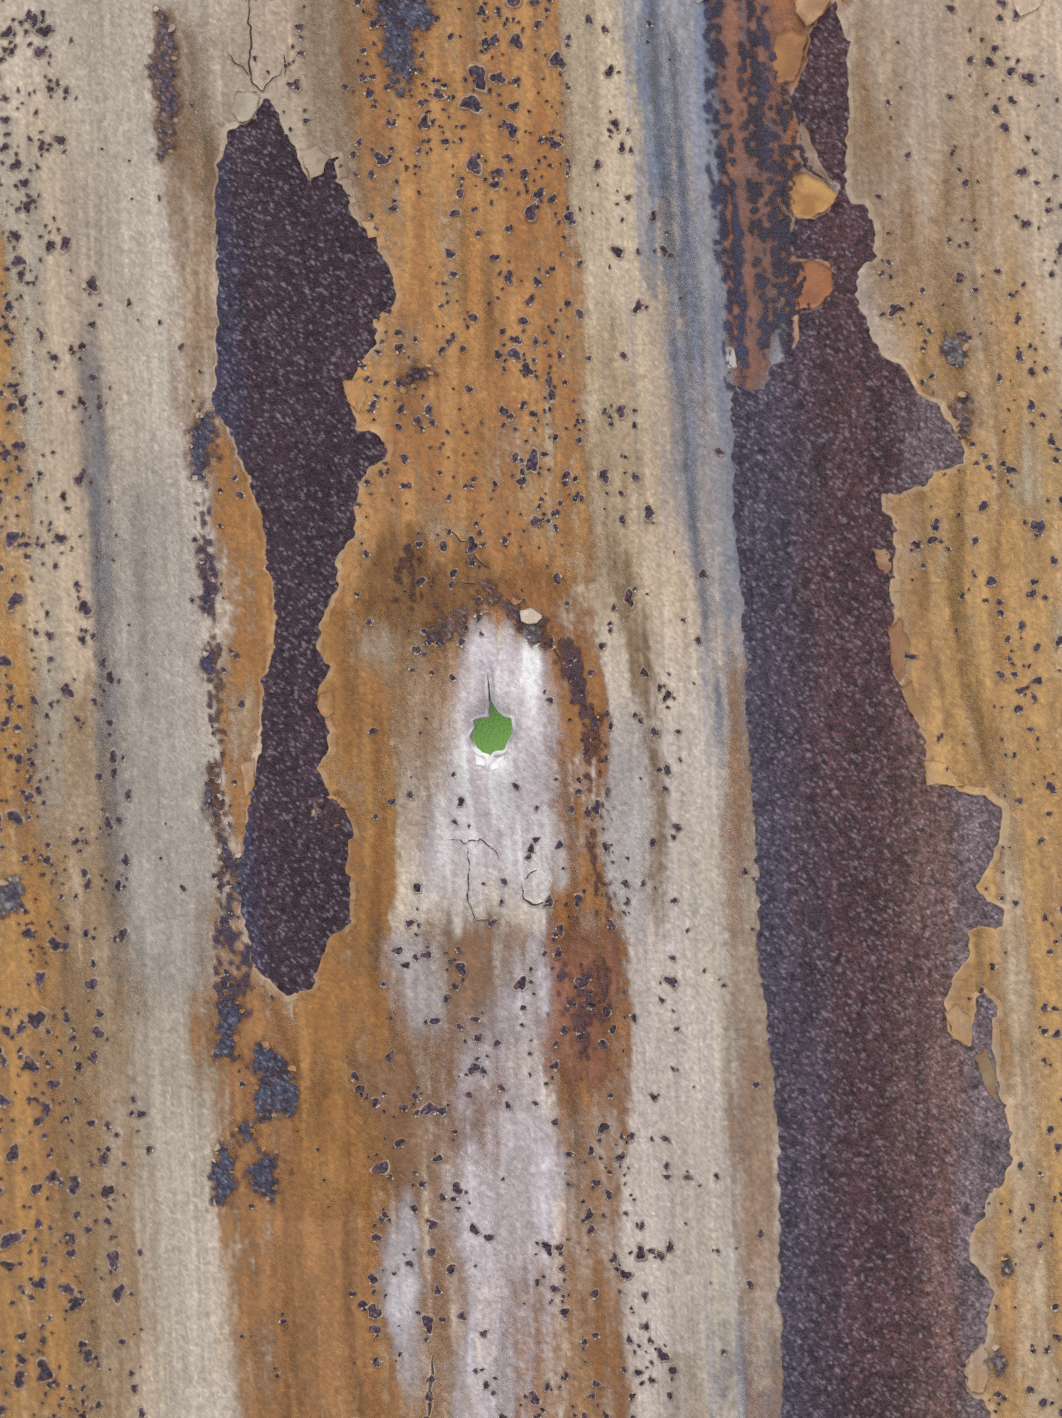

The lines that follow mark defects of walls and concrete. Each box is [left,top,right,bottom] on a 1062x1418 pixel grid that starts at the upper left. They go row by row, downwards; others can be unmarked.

corrosion [0,7,112,590]
corrosion [0,602,155,1418]
peeling [145,6,182,162]
crack [228,0,288,93]
peeling [187,91,403,1002]
peeling [363,0,436,102]
corrosion [179,0,721,1418]
spalling [415,30,527,133]
corrosion [702,0,820,391]
peeling [728,0,1020,1418]
corrosion [879,268,1062,1418]
corrosion [966,26,1062,231]